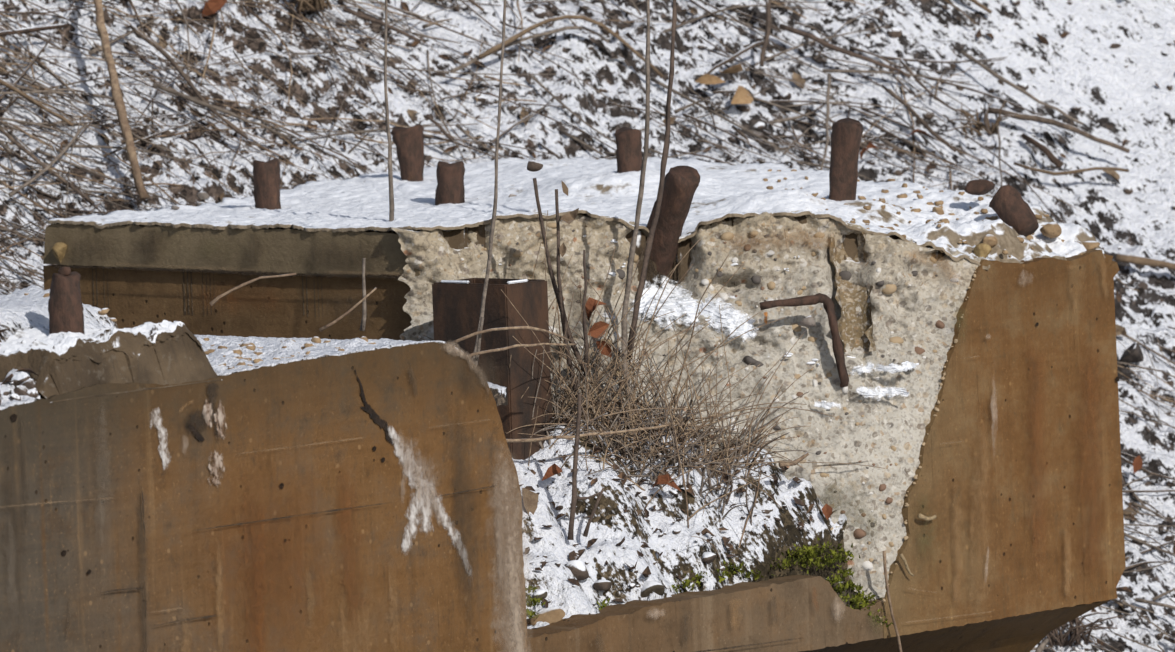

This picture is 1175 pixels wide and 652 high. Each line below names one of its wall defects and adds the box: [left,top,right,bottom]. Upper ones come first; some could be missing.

spalling [695,223,790,311]
spalling [834,271,852,290]
spalling [871,261,918,295]
crack [355,369,394,445]
spalling [447,344,486,384]
spalling [743,356,767,379]
spalling [773,368,832,402]
rust [760,293,849,388]
spalling [889,331,937,358]
damp [151,409,169,466]
damp [388,428,471,575]
spalling [830,460,893,571]